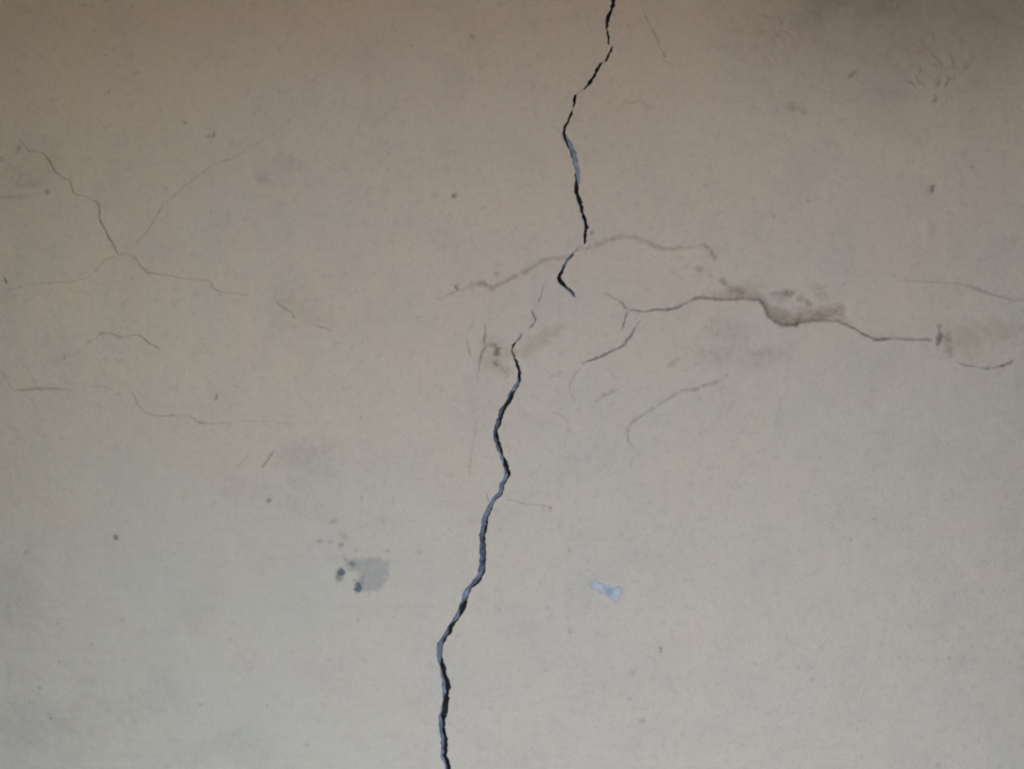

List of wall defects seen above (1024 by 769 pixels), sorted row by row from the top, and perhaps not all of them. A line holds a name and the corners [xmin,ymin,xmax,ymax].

crack [557,0,616,297]
crack [436,320,536,769]